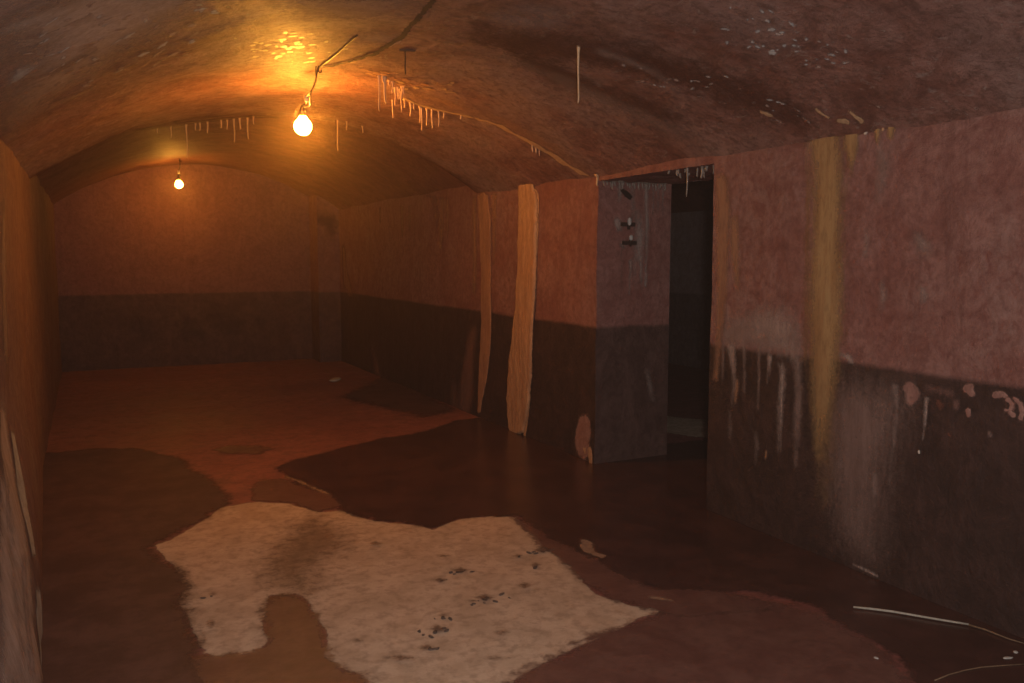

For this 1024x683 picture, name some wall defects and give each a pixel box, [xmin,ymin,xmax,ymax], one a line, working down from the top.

efflorescence [139,116,278,158]
efflorescence [365,70,714,287]
water stain [252,127,1024,683]
peeling [903,381,941,425]
peeling [963,384,975,417]
peeling [992,391,1024,421]